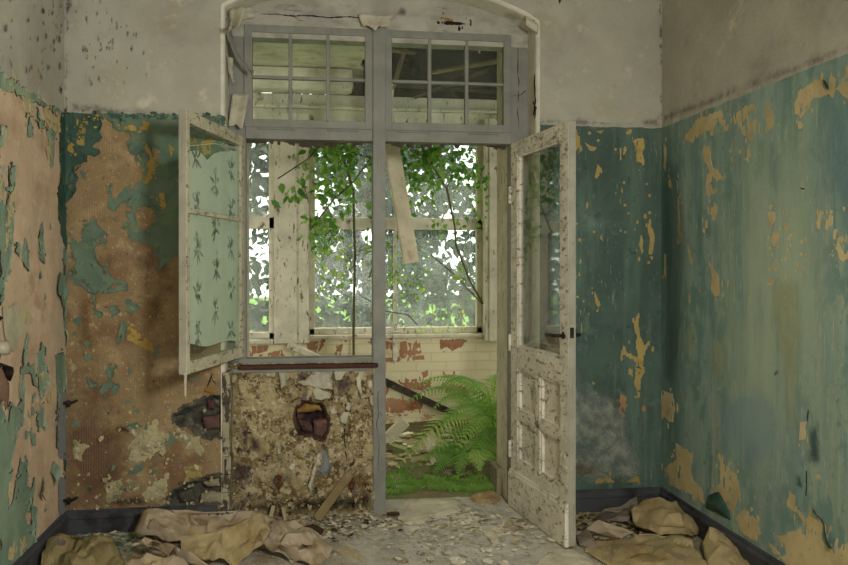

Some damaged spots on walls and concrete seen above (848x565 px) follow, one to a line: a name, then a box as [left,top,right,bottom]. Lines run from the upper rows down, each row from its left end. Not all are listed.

crack [269,13,358,21]
peeling [196,6,255,129]
peeling [190,127,226,160]
peeling [0,66,179,361]
peeling [0,333,61,565]
spalling [165,472,225,506]
spalling [171,376,223,441]
spalling [292,371,352,491]
leakage [576,389,639,479]
peeling [617,313,654,418]
peeling [661,443,762,542]
peeling [769,491,848,565]